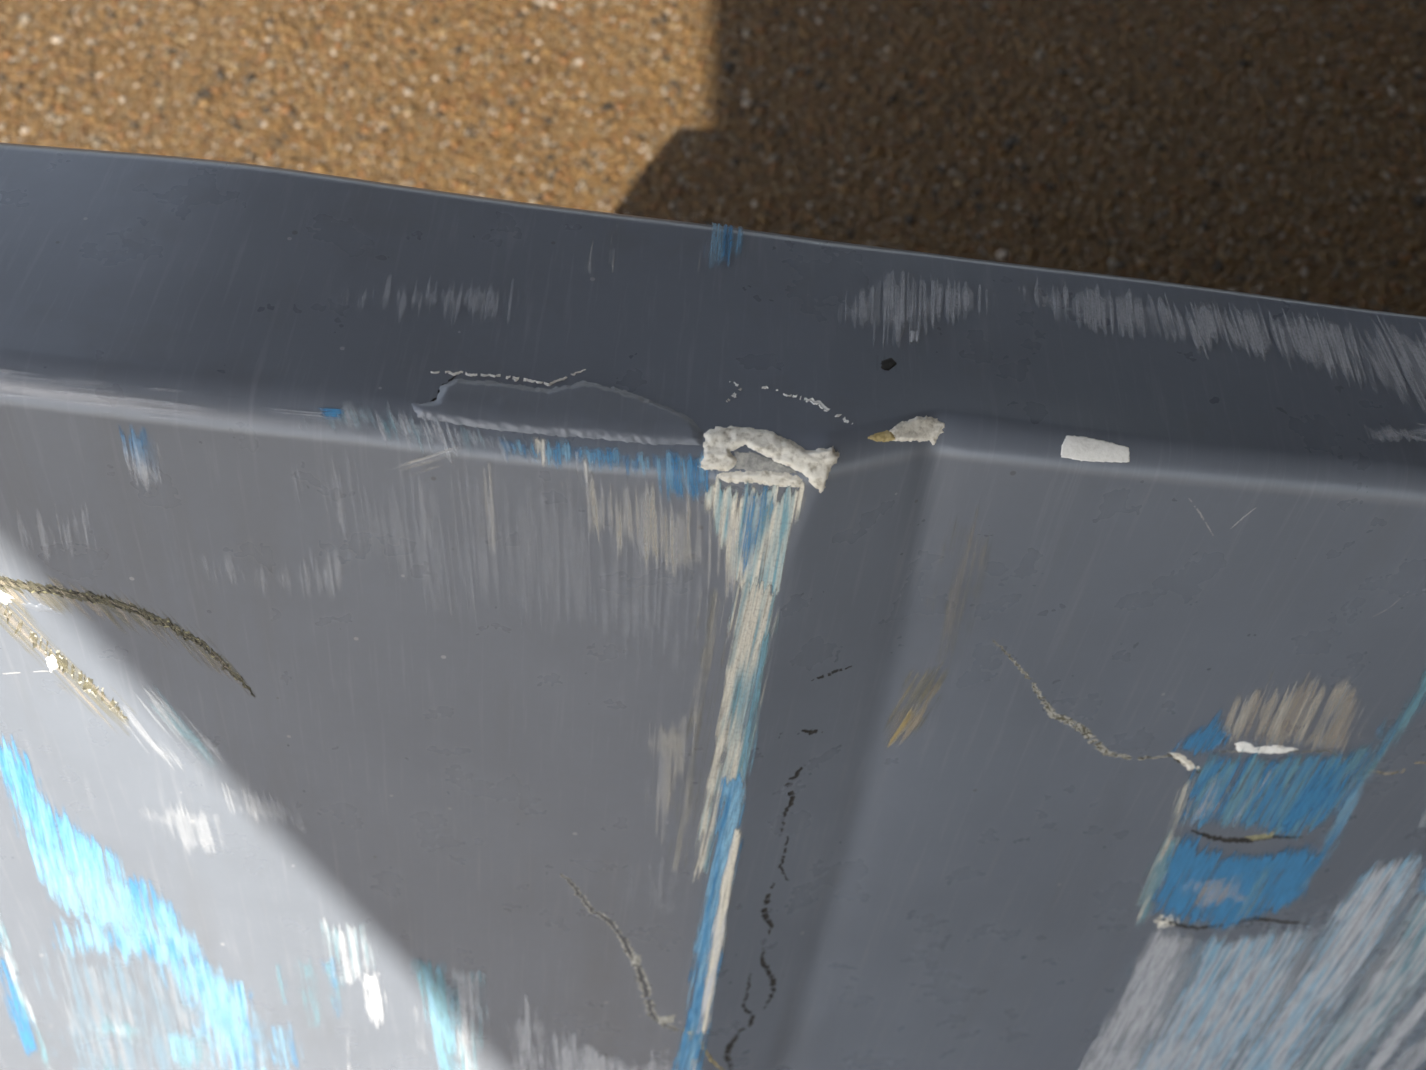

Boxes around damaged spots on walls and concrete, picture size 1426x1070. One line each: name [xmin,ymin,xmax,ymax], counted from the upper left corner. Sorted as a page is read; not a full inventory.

peeling [697,426,840,493]
peeling [868,415,945,445]
peeling [1061,435,1130,463]
crack [0,576,255,720]
crack [811,666,852,681]
crack [992,639,1426,800]
crack [1191,829,1303,843]
crack [560,729,823,1070]
crack [1153,887,1311,931]